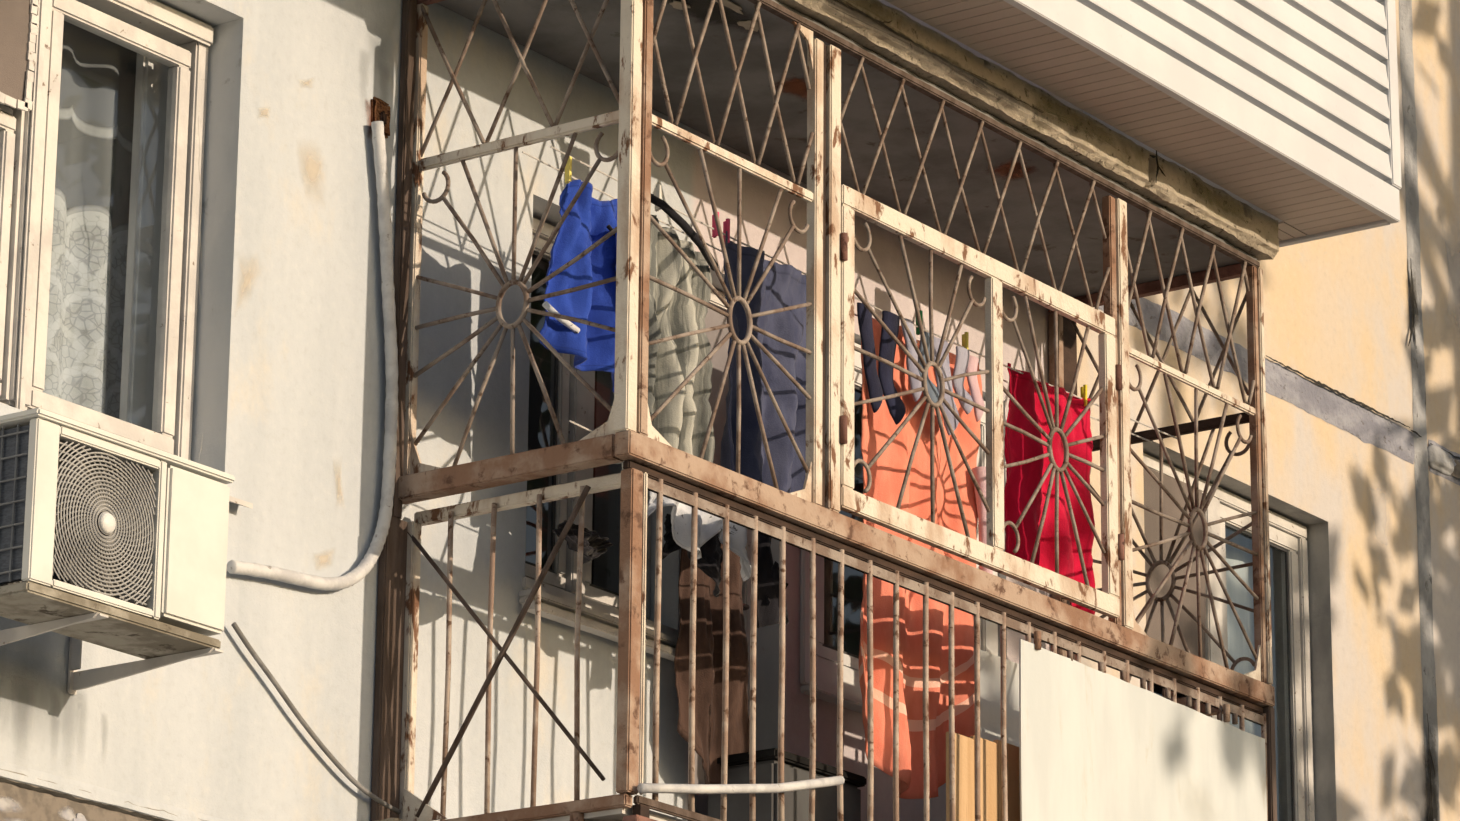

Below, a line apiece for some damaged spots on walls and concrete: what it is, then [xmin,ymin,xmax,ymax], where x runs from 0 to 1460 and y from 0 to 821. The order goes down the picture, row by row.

peeling [0,777,166,821]